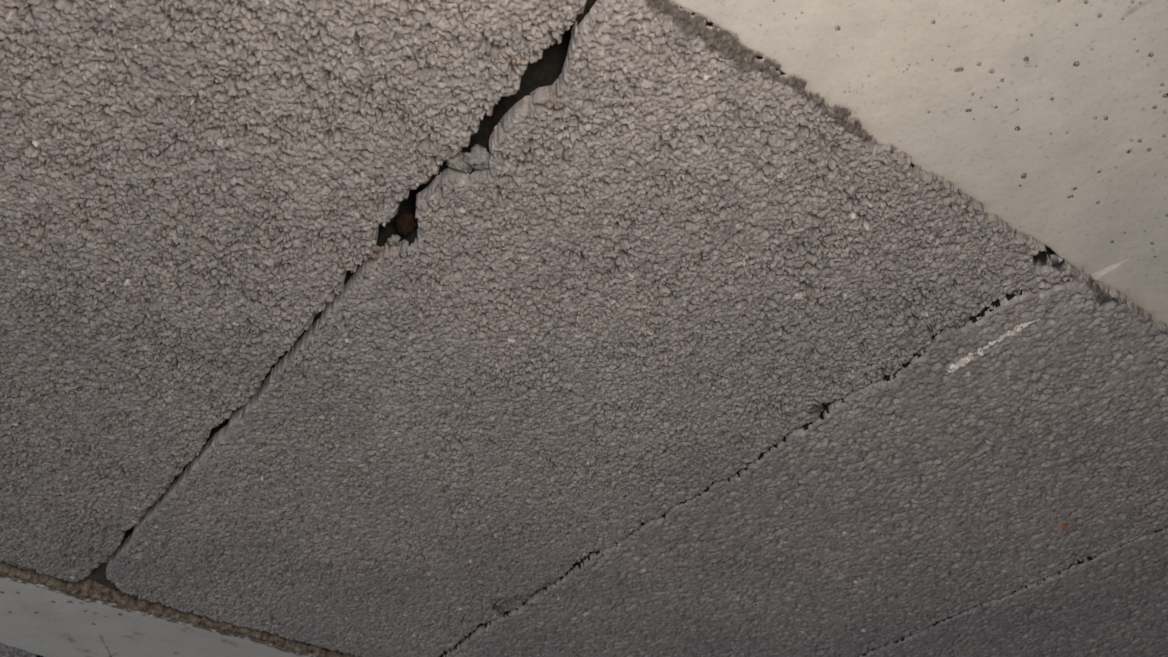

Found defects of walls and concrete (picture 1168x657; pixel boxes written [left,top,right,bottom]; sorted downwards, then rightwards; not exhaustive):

crack [110,0,597,556]